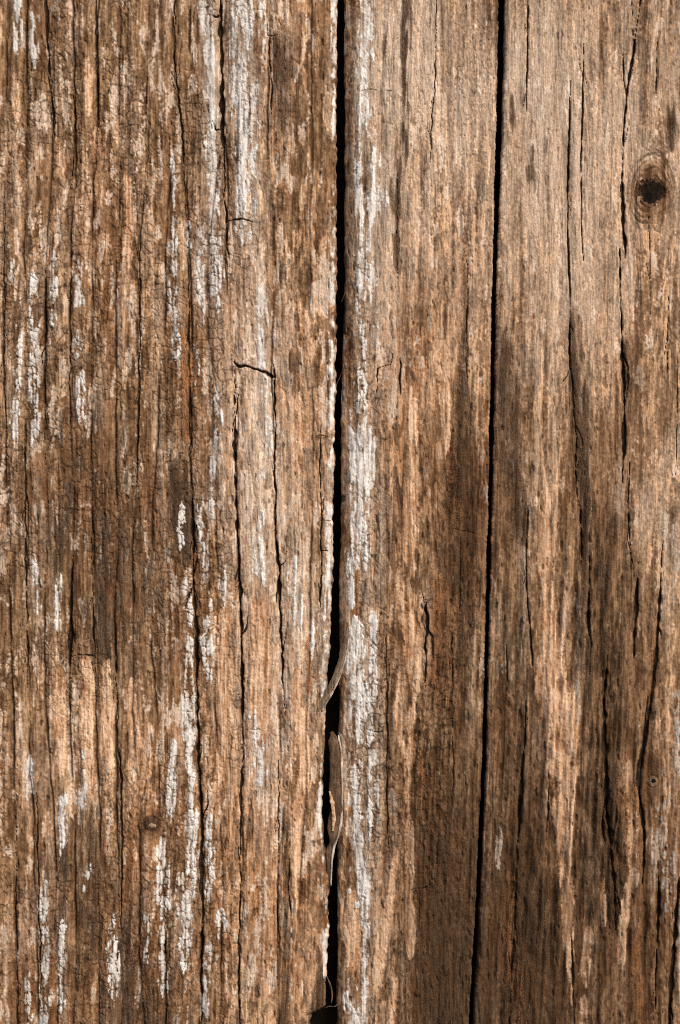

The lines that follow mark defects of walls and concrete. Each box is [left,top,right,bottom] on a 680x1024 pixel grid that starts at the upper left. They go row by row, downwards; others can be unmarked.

crack [232,360,287,1008]
crack [274,760,291,957]
crack [562,0,680,1024]